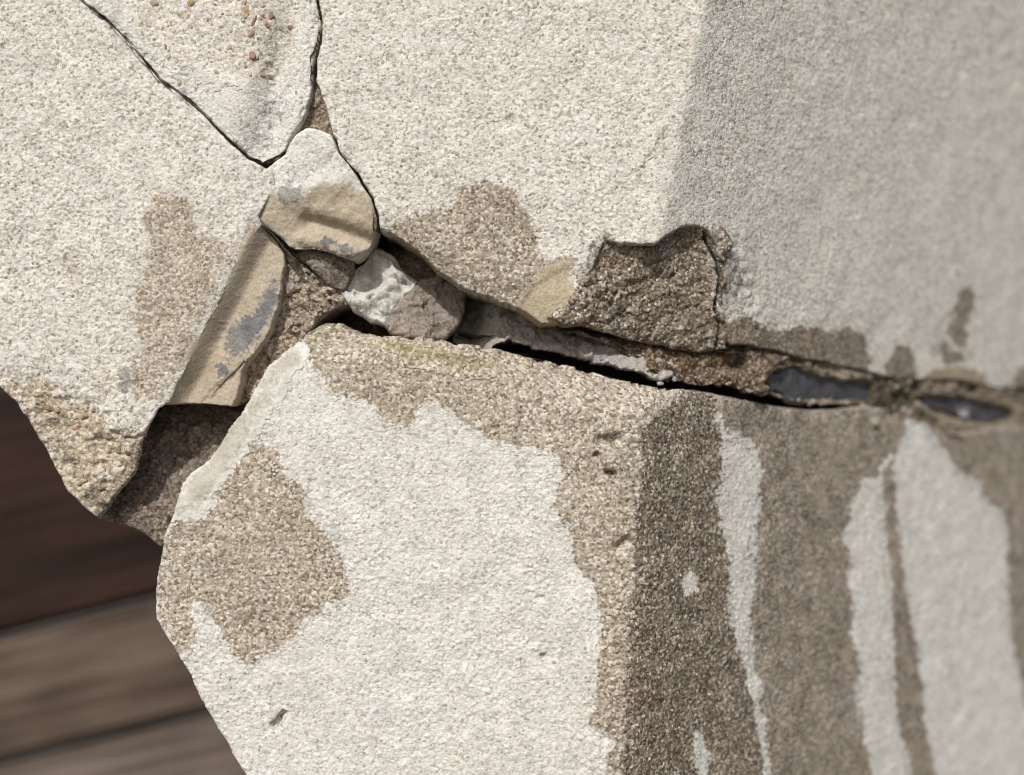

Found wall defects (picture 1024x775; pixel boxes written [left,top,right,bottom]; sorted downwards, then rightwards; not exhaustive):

crack [83,0,383,233]
crack [637,115,678,175]
spalling [0,243,352,546]
crack [209,359,247,398]
crack [262,225,298,259]
damp [383,174,626,328]
crack [454,330,810,408]
spalling [547,226,733,353]
crack [699,231,877,379]
damp [156,437,356,670]
damp [304,220,1024,775]